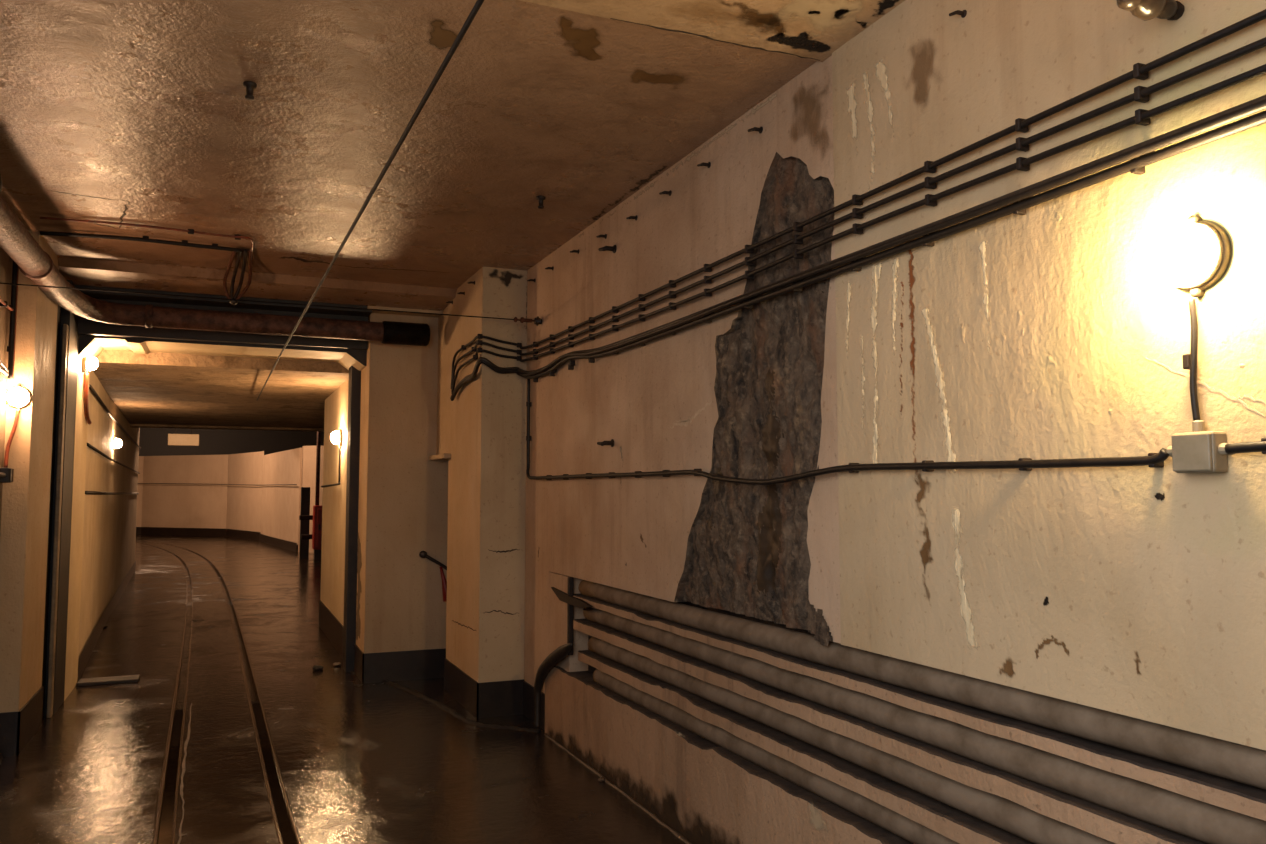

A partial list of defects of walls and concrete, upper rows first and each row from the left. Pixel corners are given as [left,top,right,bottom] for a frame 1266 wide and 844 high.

damp [429,20,457,49]
damp [560,17,601,60]
peeling [758,0,862,35]
damp [632,70,684,84]
damp [913,46,933,102]
spalling [683,156,834,646]
damp [549,731,732,844]